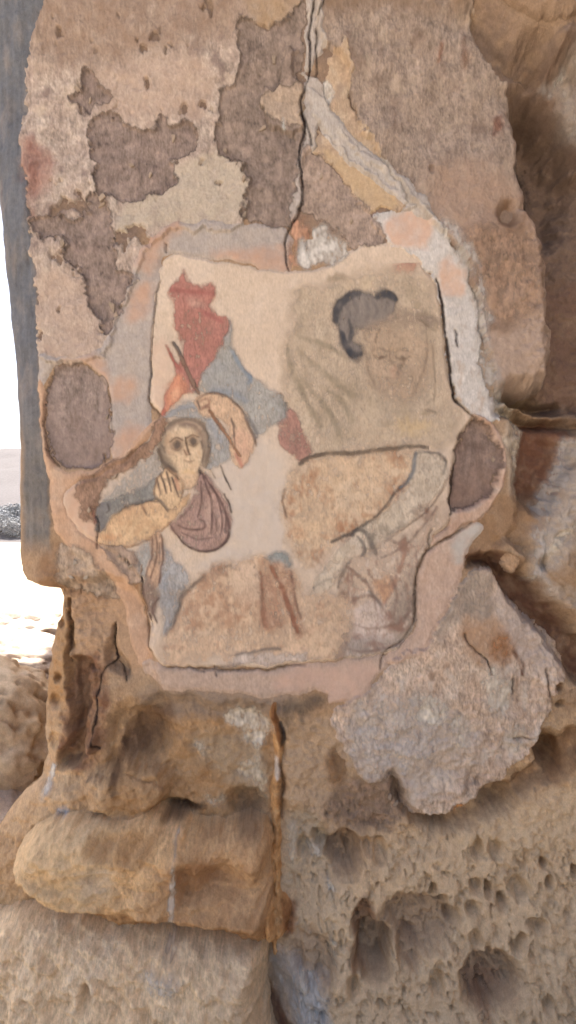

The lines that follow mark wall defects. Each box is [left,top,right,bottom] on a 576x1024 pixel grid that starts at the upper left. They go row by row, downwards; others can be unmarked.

flaking render [28,66,199,335]
flaking render [214,2,386,250]
crack [284,1,318,257]
flaking render [46,363,115,469]
crack [436,280,473,416]
flaking render [448,418,506,511]
crack [413,469,470,622]
crack [90,623,127,749]